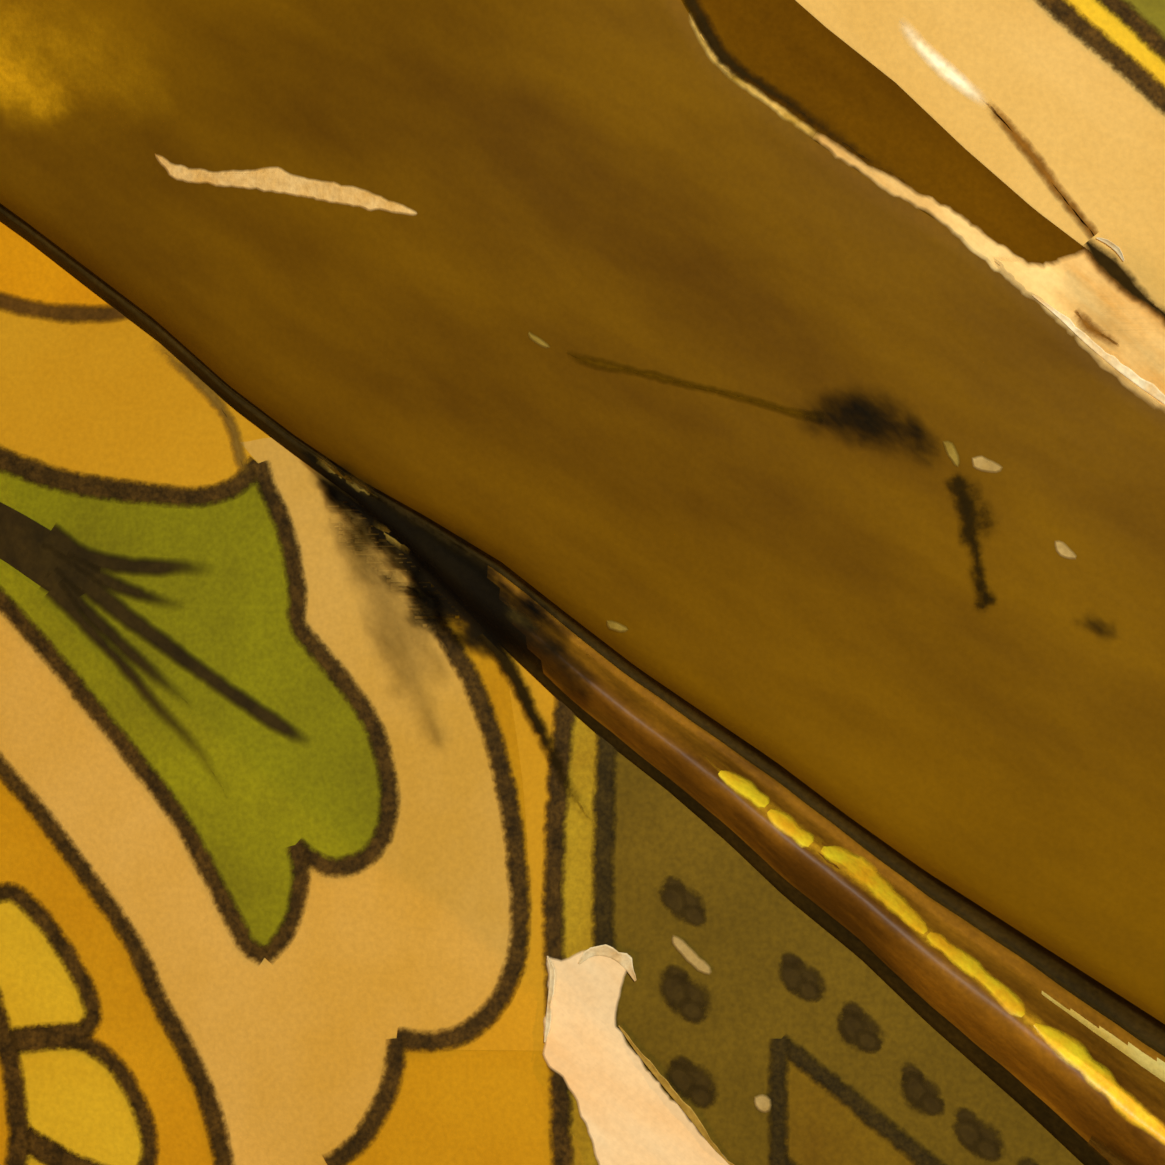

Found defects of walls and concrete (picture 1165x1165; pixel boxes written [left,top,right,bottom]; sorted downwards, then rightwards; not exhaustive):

flaking render [995,252,1165,409]
crack [576,357,924,449]
peeling [672,936,711,974]
peeling [543,944,734,1165]
peeling [755,1095,771,1112]